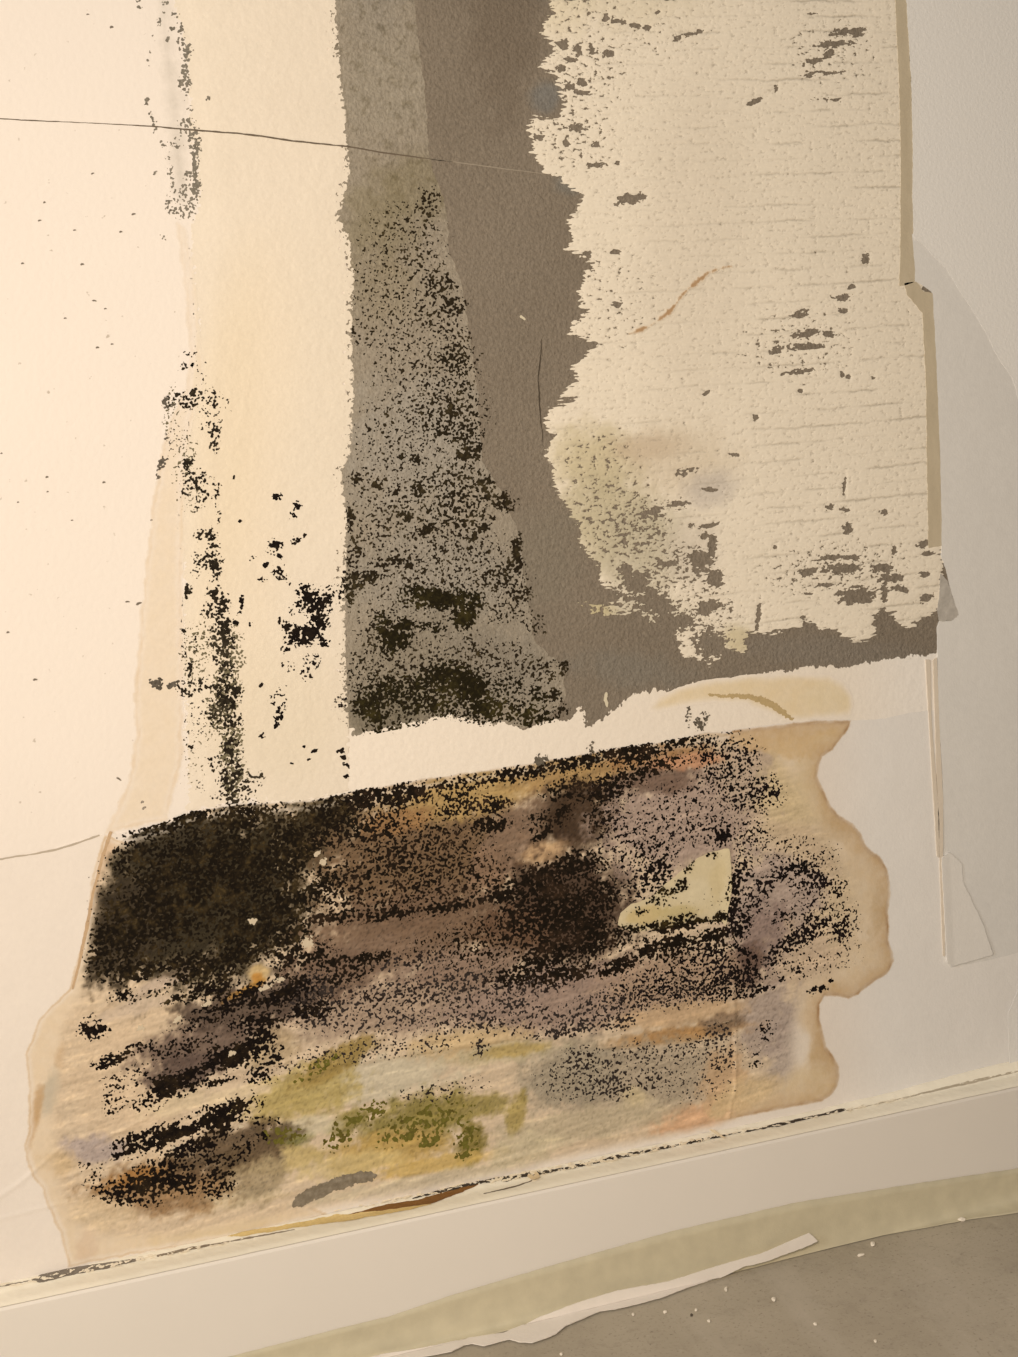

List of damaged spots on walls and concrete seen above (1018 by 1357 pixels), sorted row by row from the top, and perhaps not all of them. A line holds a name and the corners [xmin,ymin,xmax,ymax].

damp [23,185,895,1269]
peeling [330,0,949,736]